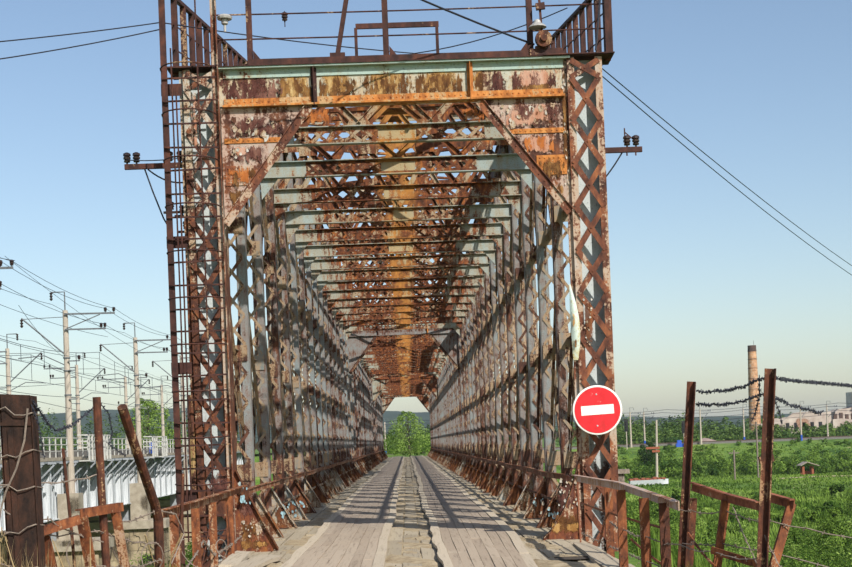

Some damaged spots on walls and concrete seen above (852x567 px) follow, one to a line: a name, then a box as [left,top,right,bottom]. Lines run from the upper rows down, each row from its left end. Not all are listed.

peeling [228,116,276,159]
corrosion [266,123,284,136]
peeling [501,73,570,185]
corrosion [228,145,267,206]
corrosion [238,496,255,519]
peeling [533,475,578,520]
corrosion [552,514,579,533]